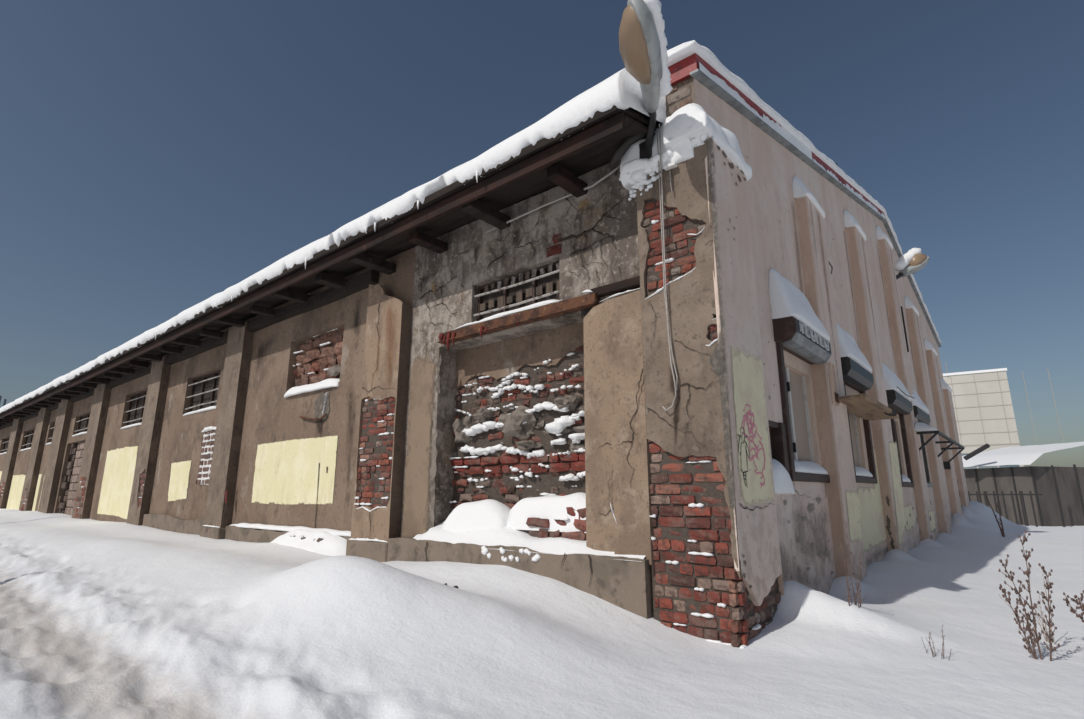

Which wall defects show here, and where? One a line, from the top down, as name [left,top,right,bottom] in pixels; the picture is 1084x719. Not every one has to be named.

crack [419,178,622,355]
spalling [642,200,706,299]
spalling [354,397,396,512]
crack [596,303,719,516]
spalling [648,440,781,649]